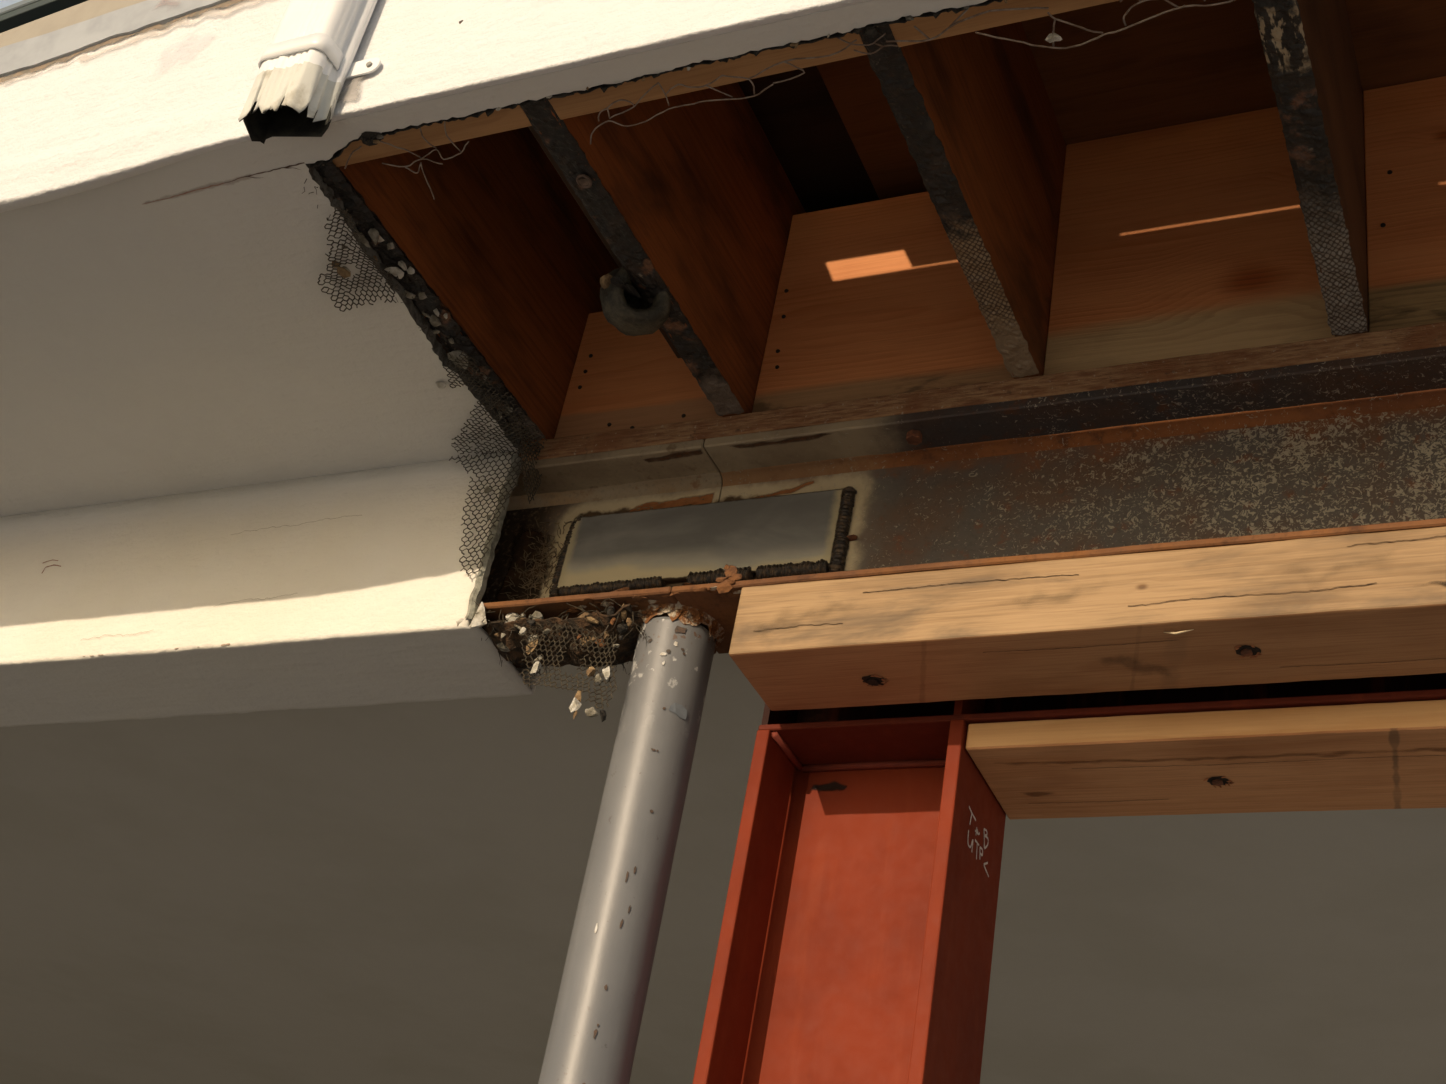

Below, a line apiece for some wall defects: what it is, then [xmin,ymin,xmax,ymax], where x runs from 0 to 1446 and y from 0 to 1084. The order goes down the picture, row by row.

crack [145,162,304,204]
spalling [303,161,687,676]